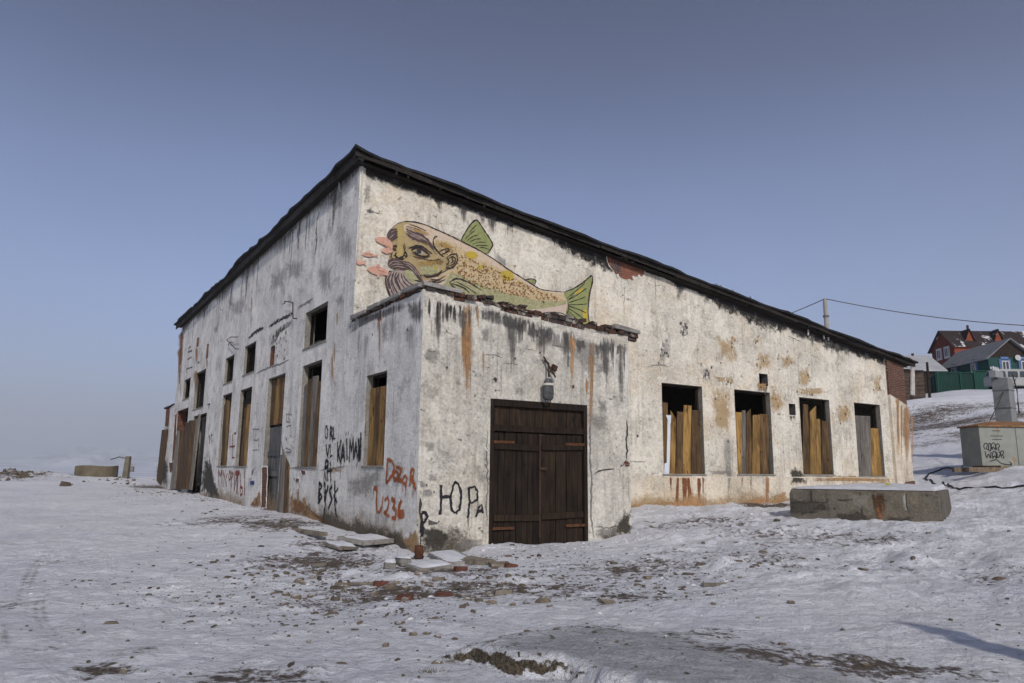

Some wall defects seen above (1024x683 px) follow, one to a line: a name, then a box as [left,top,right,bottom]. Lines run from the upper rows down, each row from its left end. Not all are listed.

flaking render [606,256,645,282]
rust [462,306,479,385]
water stain [354,299,628,397]
rust [586,343,594,419]
flaking render [700,336,737,428]
rust [896,398,913,457]
rust [670,477,705,506]